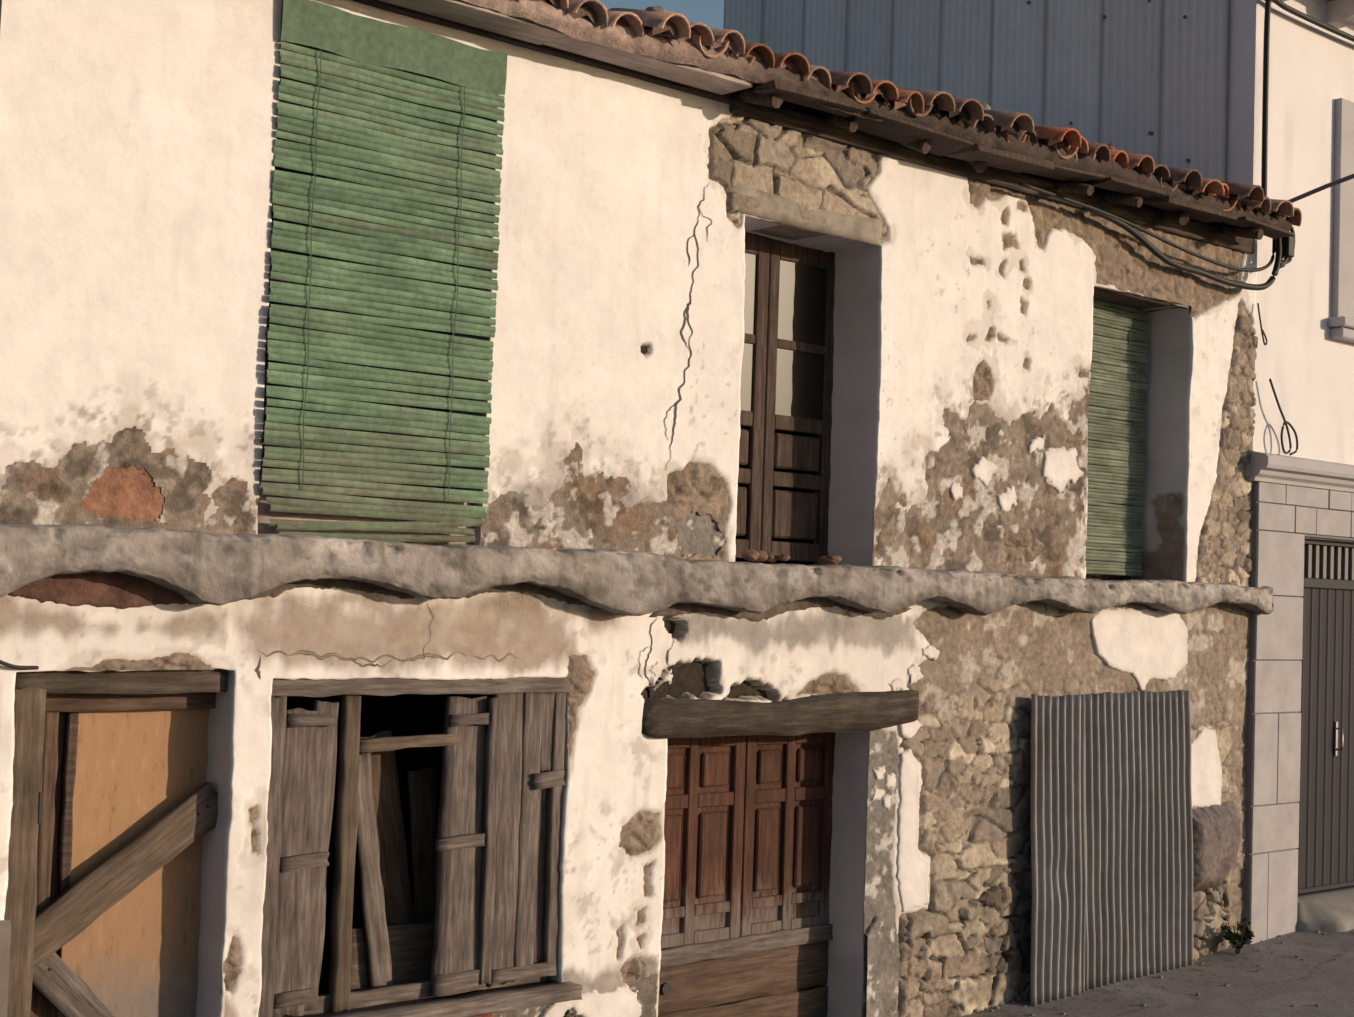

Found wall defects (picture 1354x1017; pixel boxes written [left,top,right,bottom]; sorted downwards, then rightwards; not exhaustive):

spalling [707,115,888,246]
crack [664,184,712,470]
spalling [966,179,1258,587]
peeling [0,418,258,534]
peeling [480,442,729,562]
peeling [873,359,1089,578]
crack [255,603,517,679]
spalling [248,807,258,852]
spalling [641,597,1251,1017]
spalling [220,936,241,994]
spalling [616,811,662,1017]